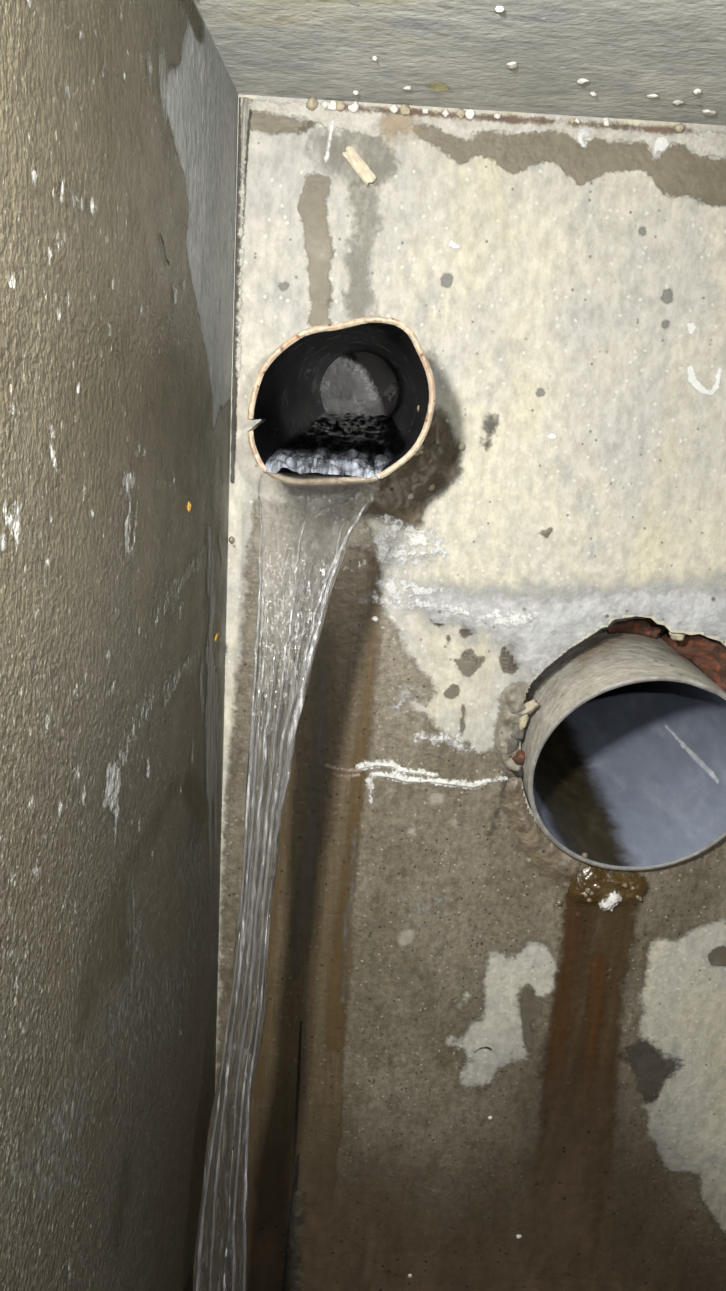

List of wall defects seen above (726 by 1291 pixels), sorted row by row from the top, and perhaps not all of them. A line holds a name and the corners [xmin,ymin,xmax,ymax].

water stain [413,123,726,206]
water stain [0,0,447,1291]
water stain [247,576,726,1291]
corrosion [540,893,640,1144]
crack [281,1021,306,1291]